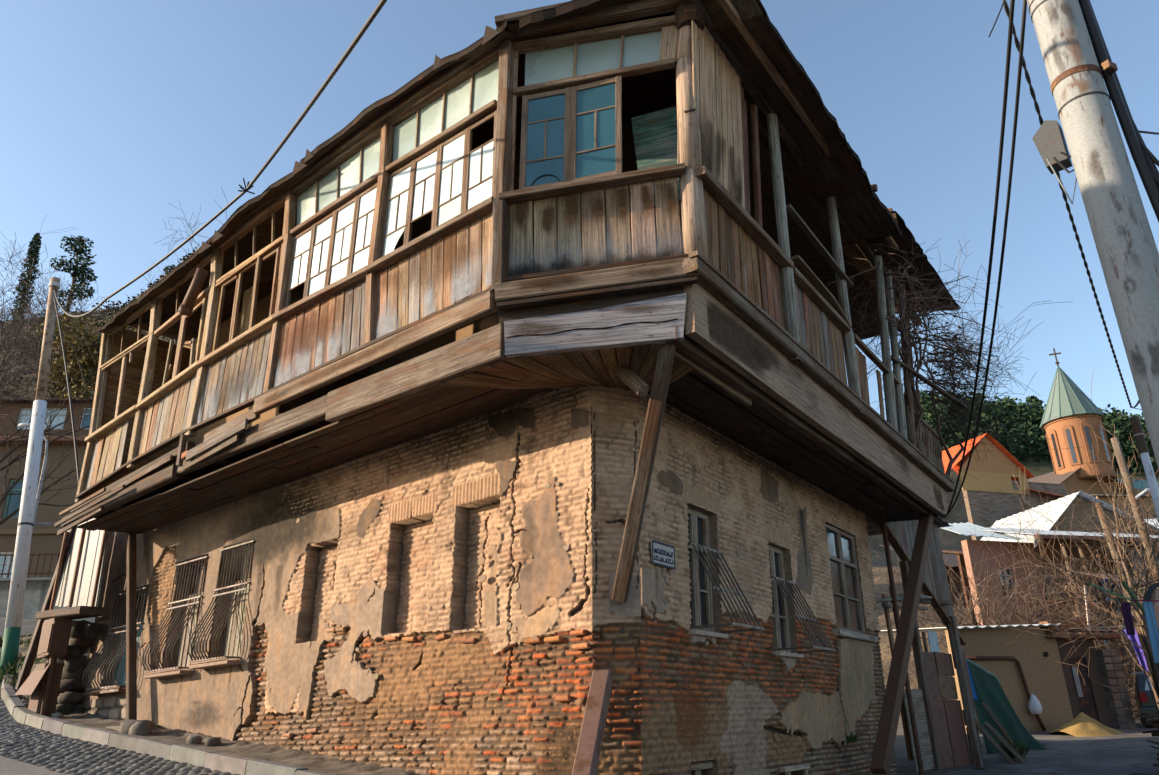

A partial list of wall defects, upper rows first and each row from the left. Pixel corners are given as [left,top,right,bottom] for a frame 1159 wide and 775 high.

water stain [236,490,317,564]
crack [467,432,527,686]
spalling [235,496,886,775]
crack [568,412,659,621]
peeling [659,470,684,494]
peeling [760,468,779,503]